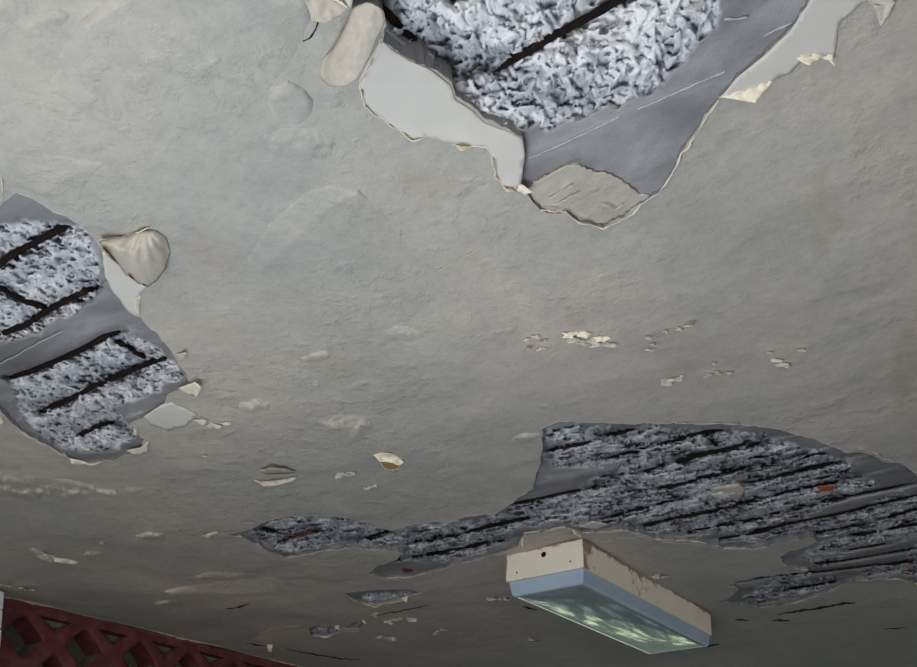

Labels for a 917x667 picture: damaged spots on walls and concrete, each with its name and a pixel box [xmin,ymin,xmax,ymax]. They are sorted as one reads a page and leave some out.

spalling [305,0,904,230]
spalling [0,175,231,465]
crack [248,643,361,660]
spalling [202,421,917,652]
crack [772,602,855,622]